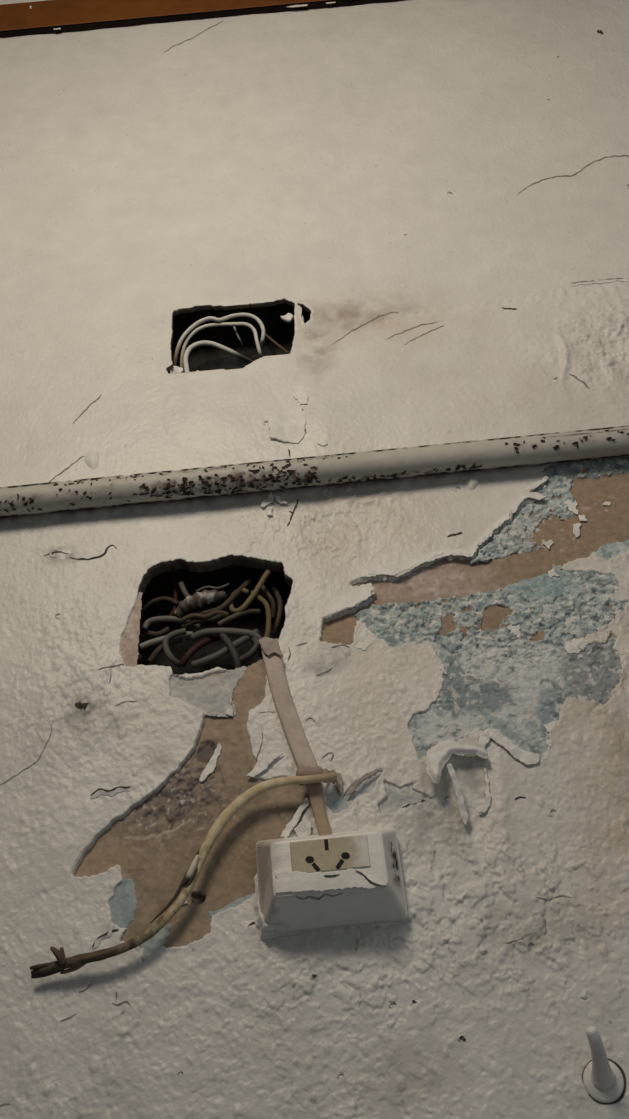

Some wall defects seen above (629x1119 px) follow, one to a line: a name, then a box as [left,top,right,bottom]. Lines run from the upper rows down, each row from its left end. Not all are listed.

crack [518,155,629,194]
corrosion [0,494,42,513]
corrosion [53,456,482,508]
crack [44,545,117,560]
spalling [120,592,142,667]
peeling [320,456,629,825]
crack [0,719,54,785]
peeling [74,659,312,963]